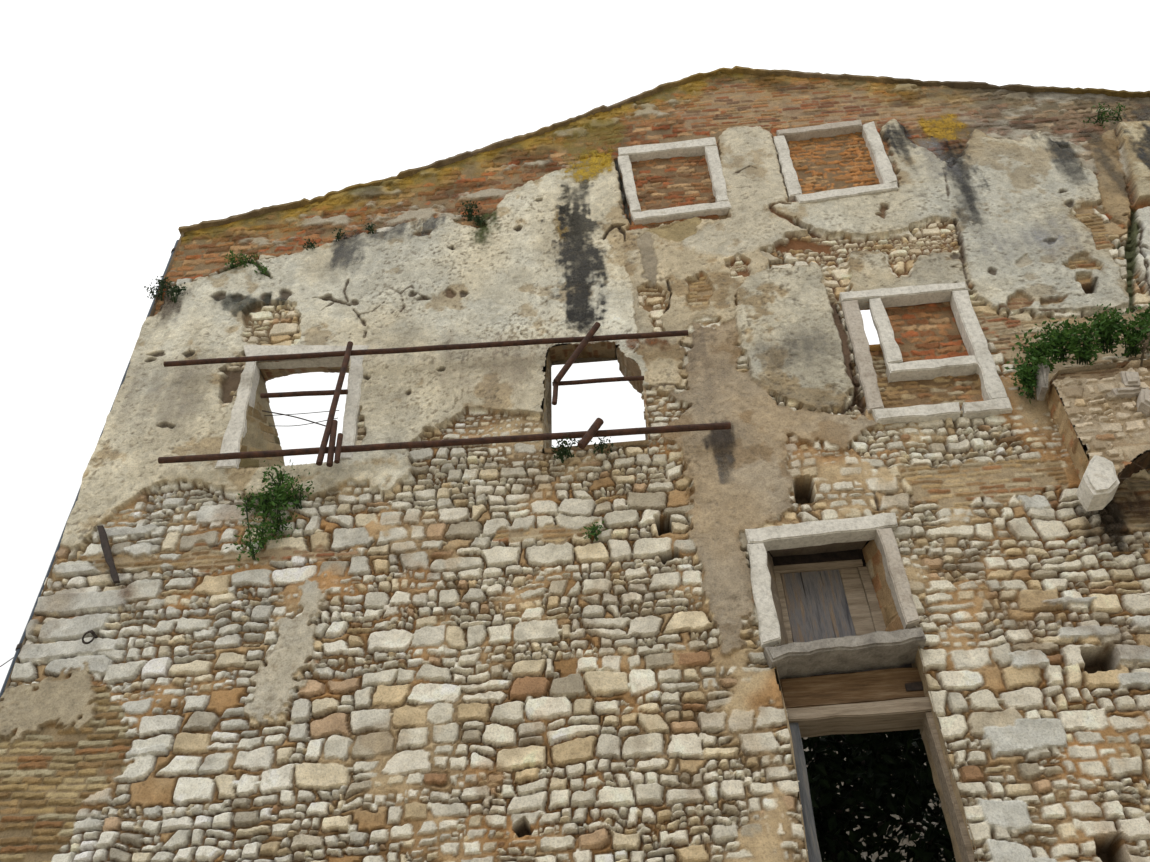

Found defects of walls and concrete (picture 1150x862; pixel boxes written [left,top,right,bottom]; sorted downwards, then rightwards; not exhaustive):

damp [884,123,979,222]
damp [1124,106,1150,169]
damp [553,179,607,333]
spalling [635,217,702,332]
spalling [686,272,714,308]
spalling [724,254,750,278]
spalling [772,216,960,305]
crack [1113,208,1150,313]
spalling [213,290,301,407]
spalling [407,407,554,475]